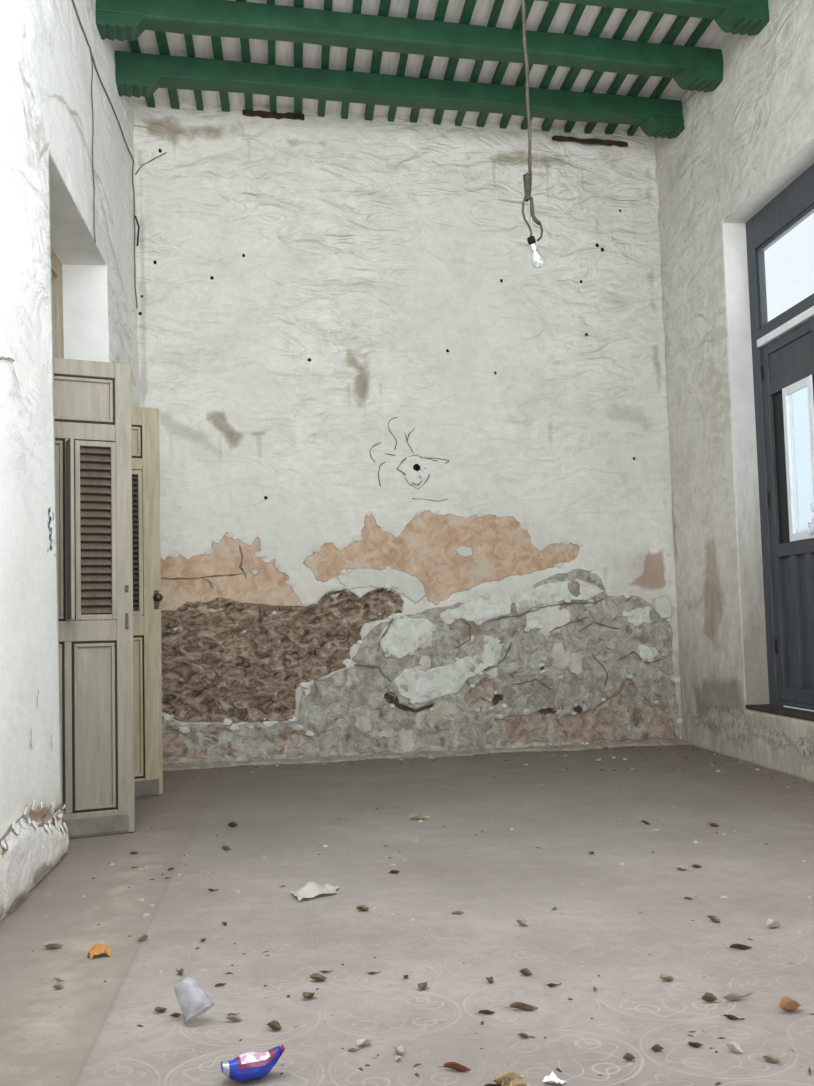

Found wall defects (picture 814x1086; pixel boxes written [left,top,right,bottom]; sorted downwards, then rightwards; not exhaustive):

crack [0,356,22,399]
spalling [161,509,682,764]
spalling [24,801,65,832]